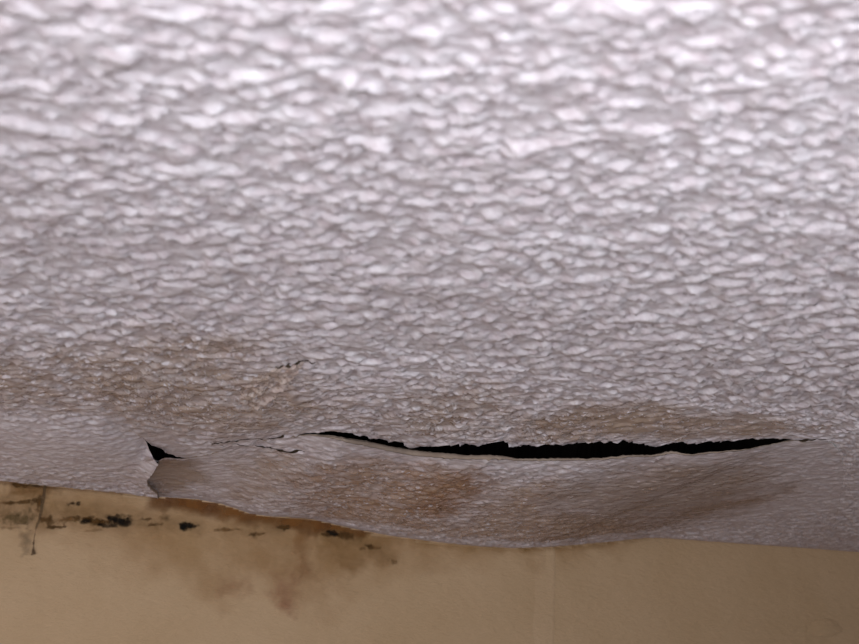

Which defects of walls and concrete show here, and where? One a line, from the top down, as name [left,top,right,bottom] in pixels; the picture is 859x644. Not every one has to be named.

crack [276,360,316,369]
leakage [540,408,716,437]
crack [212,431,826,461]
leakage [5,483,131,529]
leakage [313,467,478,520]